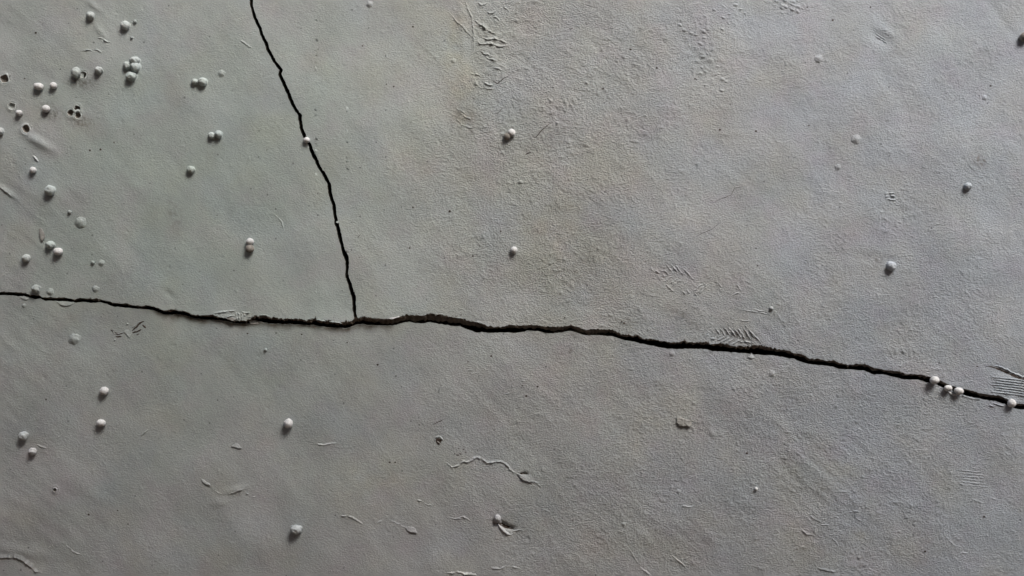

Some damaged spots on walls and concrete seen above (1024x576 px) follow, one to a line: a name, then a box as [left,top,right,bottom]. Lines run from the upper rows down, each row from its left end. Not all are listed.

crack [0,0,1024,410]